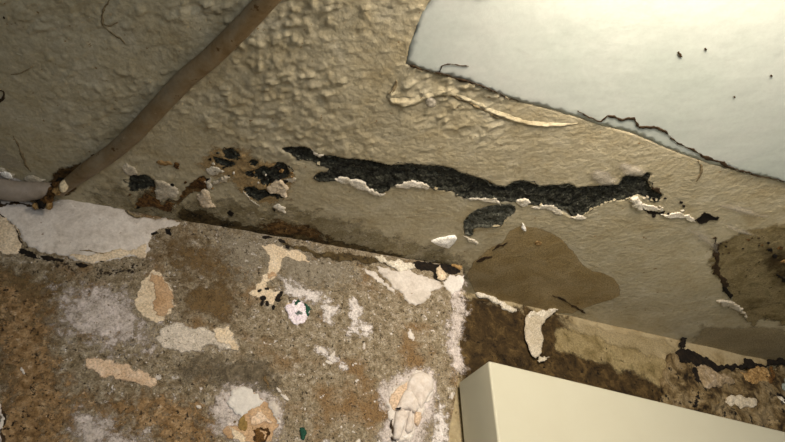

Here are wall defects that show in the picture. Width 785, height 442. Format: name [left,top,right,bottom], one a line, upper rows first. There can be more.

crack [101,0,126,44]
crack [0,67,32,103]
crack [578,111,785,182]
flaking render [208,146,719,249]
peeling [0,199,180,268]
flaking render [257,287,311,325]
leakage [149,204,666,402]
peeling [365,255,464,306]
peeling [524,308,558,363]
spalling [658,224,785,432]
leakage [746,303,785,325]
flaking render [222,386,281,442]